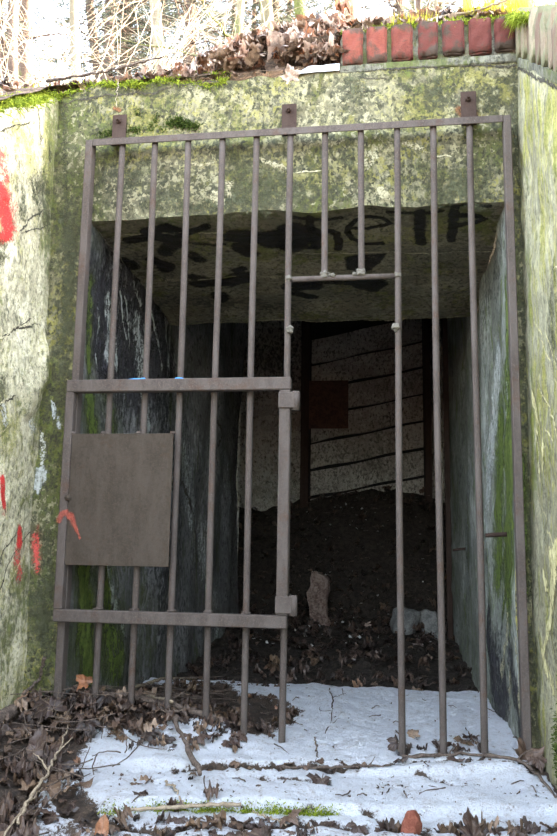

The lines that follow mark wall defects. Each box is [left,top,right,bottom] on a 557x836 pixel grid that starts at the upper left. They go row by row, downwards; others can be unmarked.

water stain [201,140,240,156]
water stain [512,67,521,222]
water stain [145,164,307,218]
crack [20,210,49,234]
crack [0,318,38,339]
water stain [484,276,514,624]
water stain [75,565,121,610]
water stain [522,452,537,711]
water stain [75,622,125,690]